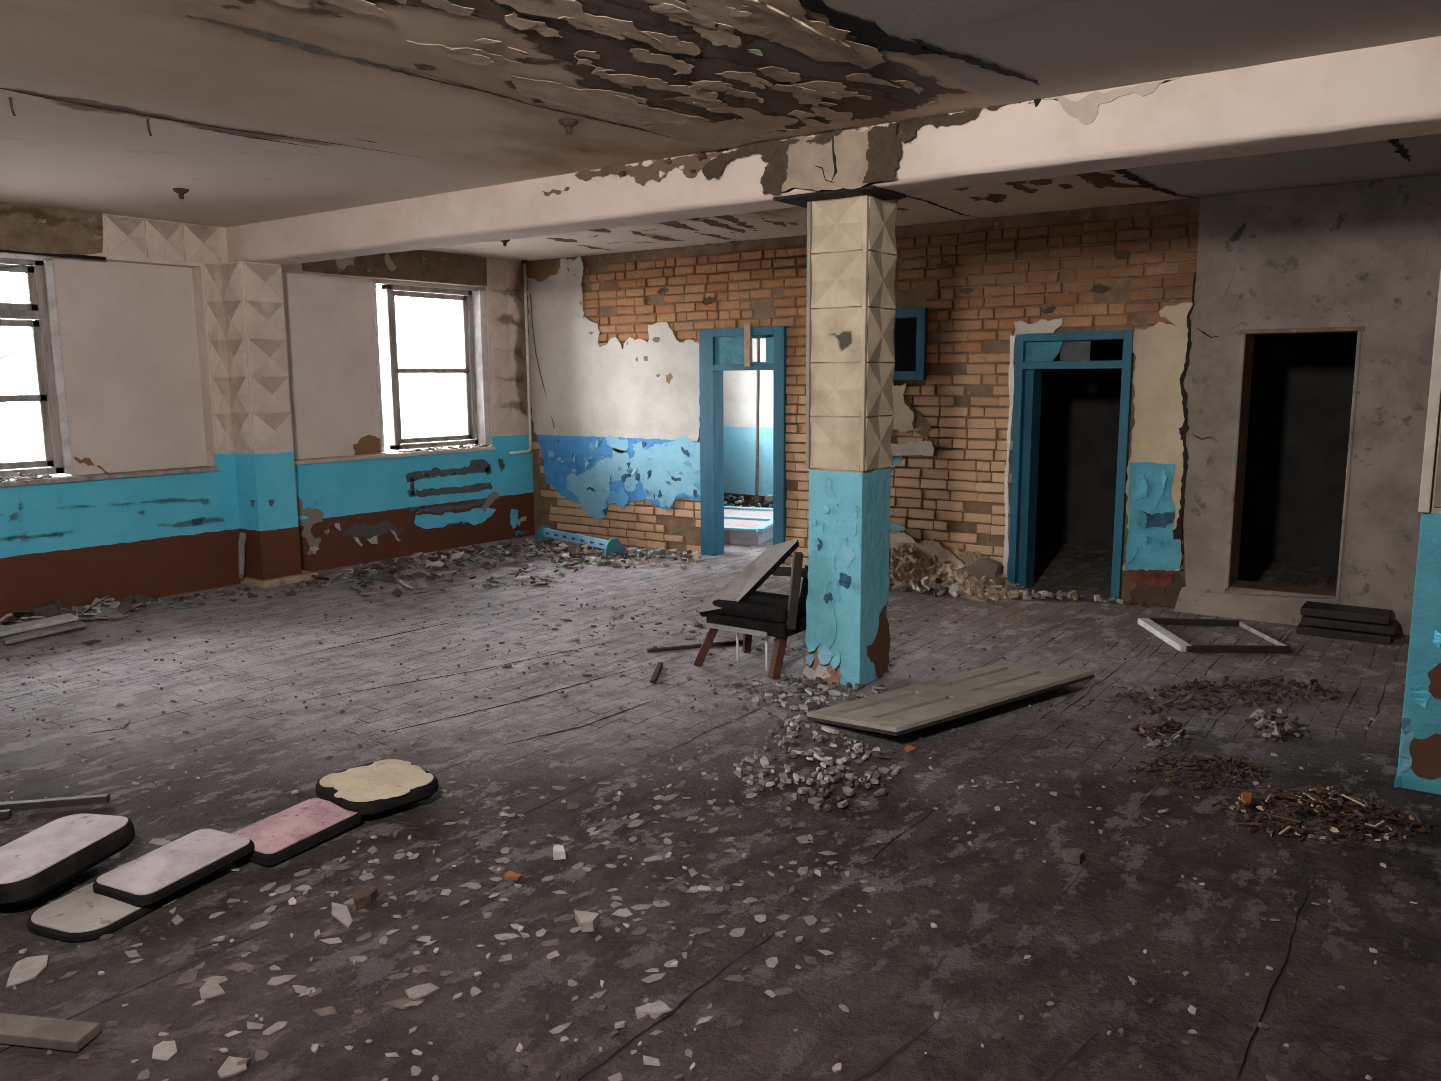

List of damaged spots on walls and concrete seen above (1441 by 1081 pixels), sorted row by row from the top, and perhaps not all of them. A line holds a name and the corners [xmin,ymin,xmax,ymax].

peeling [274,0,1182,196]
peeling [954,172,1150,203]
spalling [302,250,487,286]
peeling [296,471,527,555]
spalling [532,215,859,685]
spalling [889,212,1200,580]
peeling [1125,462,1186,608]
crack [1173,273,1220,571]
spalling [867,601,891,678]
spalling [1394,630,1441,788]